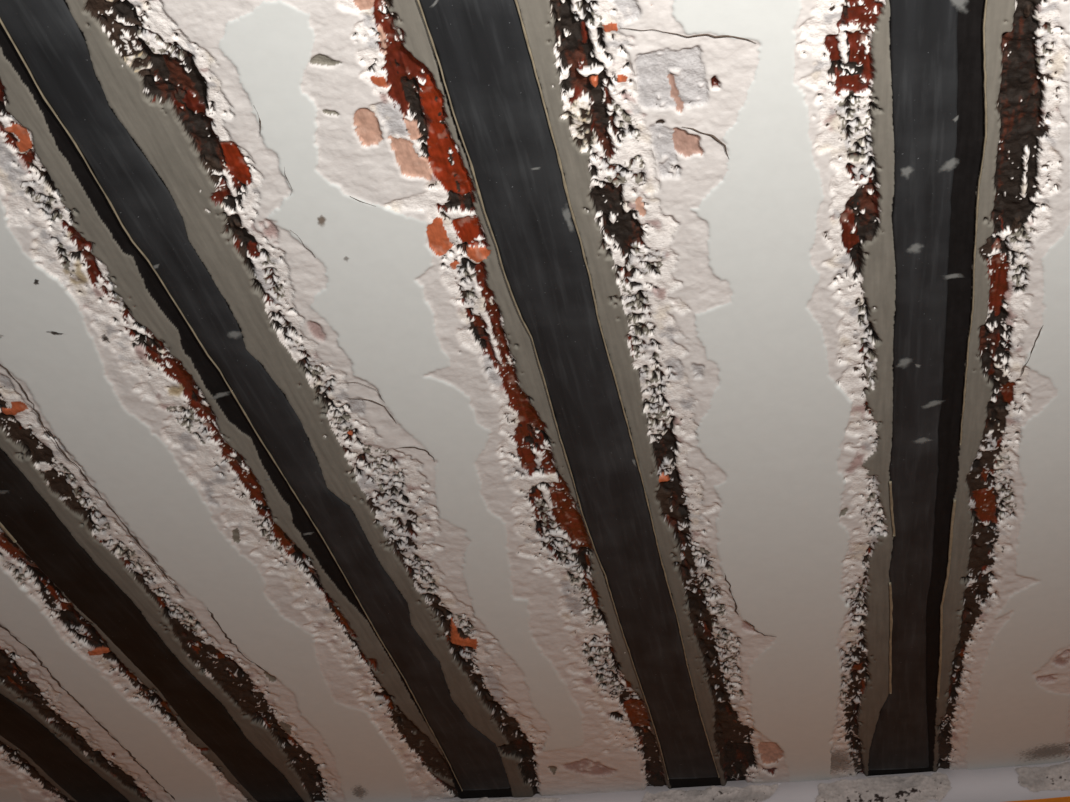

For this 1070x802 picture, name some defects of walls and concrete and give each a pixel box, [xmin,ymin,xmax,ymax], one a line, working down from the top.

spalling [0,0,791,802]
crack [624,28,757,44]
spalling [793,0,1070,779]